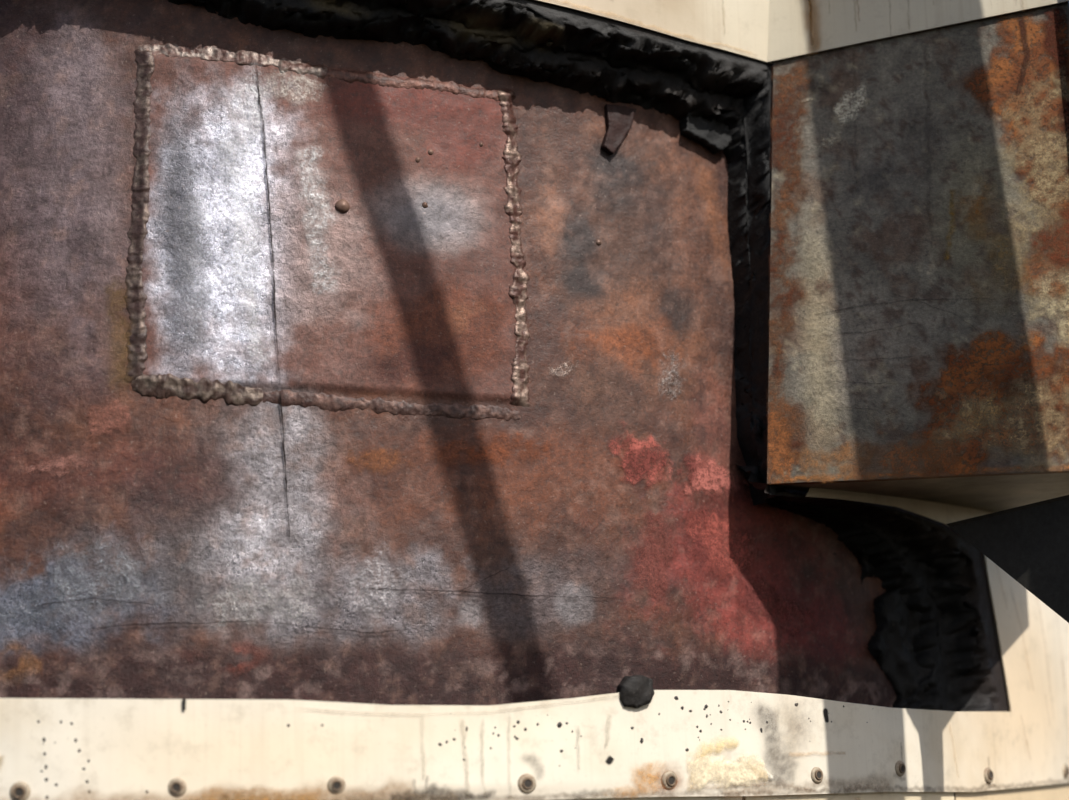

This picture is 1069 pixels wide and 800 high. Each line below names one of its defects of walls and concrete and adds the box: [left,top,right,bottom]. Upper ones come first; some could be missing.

crack [257,73,279,367]
corrosion [768,61,938,483]
corrosion [965,8,1069,373]
crack [279,395,290,536]